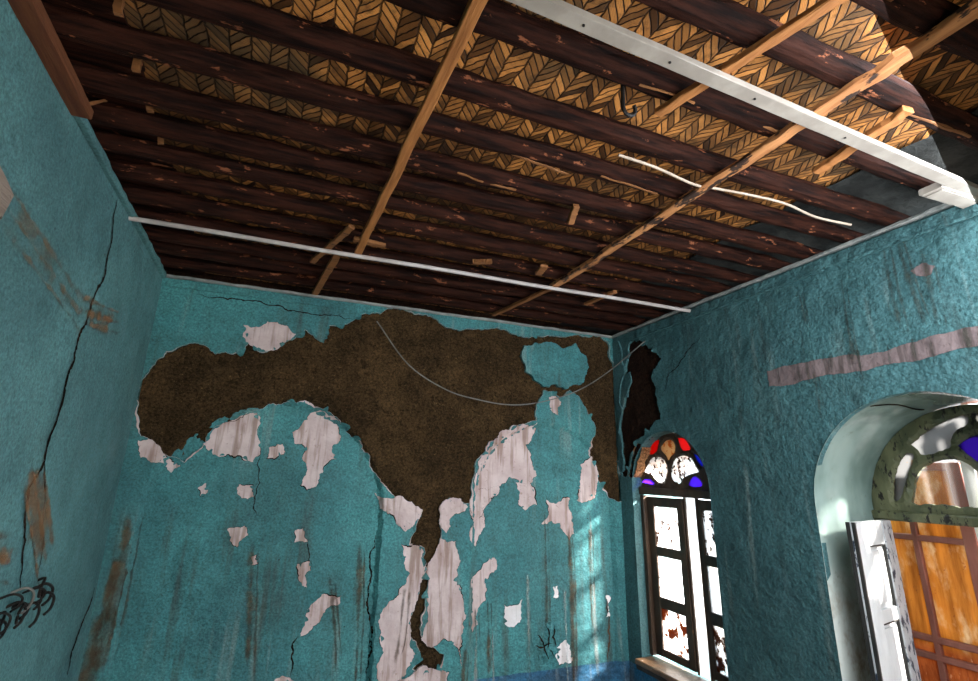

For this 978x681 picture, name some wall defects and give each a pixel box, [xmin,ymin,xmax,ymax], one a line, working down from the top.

rust [26,471,54,576]
crack [20,202,117,588]
crack [67,588,95,675]
flaking render [135,308,661,681]